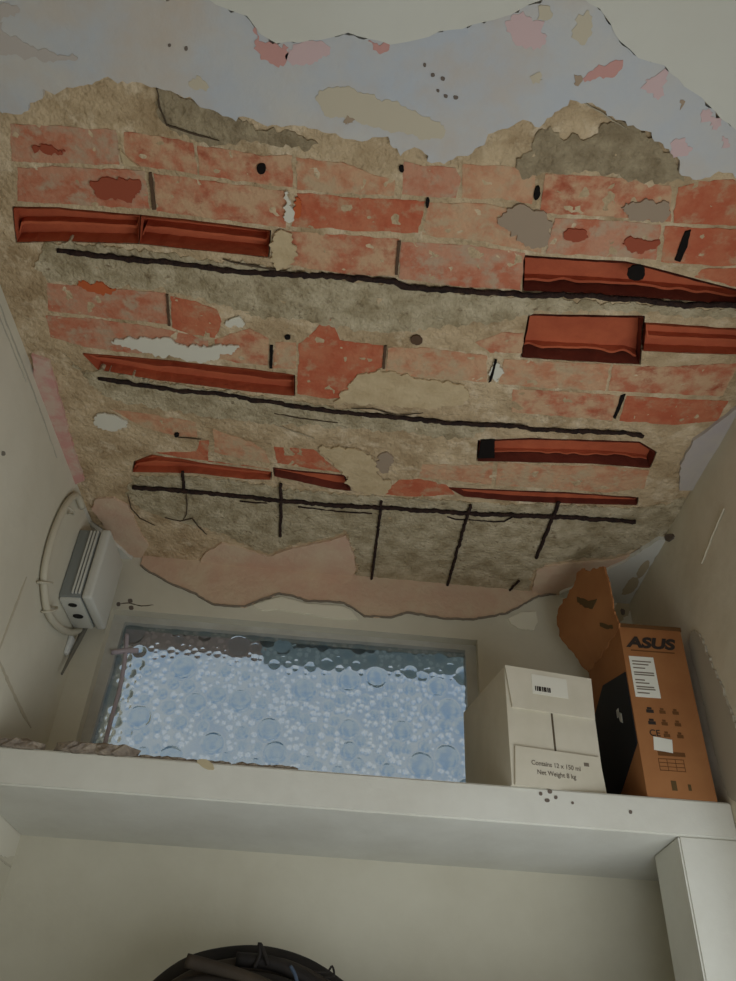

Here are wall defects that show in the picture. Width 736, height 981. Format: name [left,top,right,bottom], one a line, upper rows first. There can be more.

peeling [0,0,736,574]
peeling [253,597,358,620]